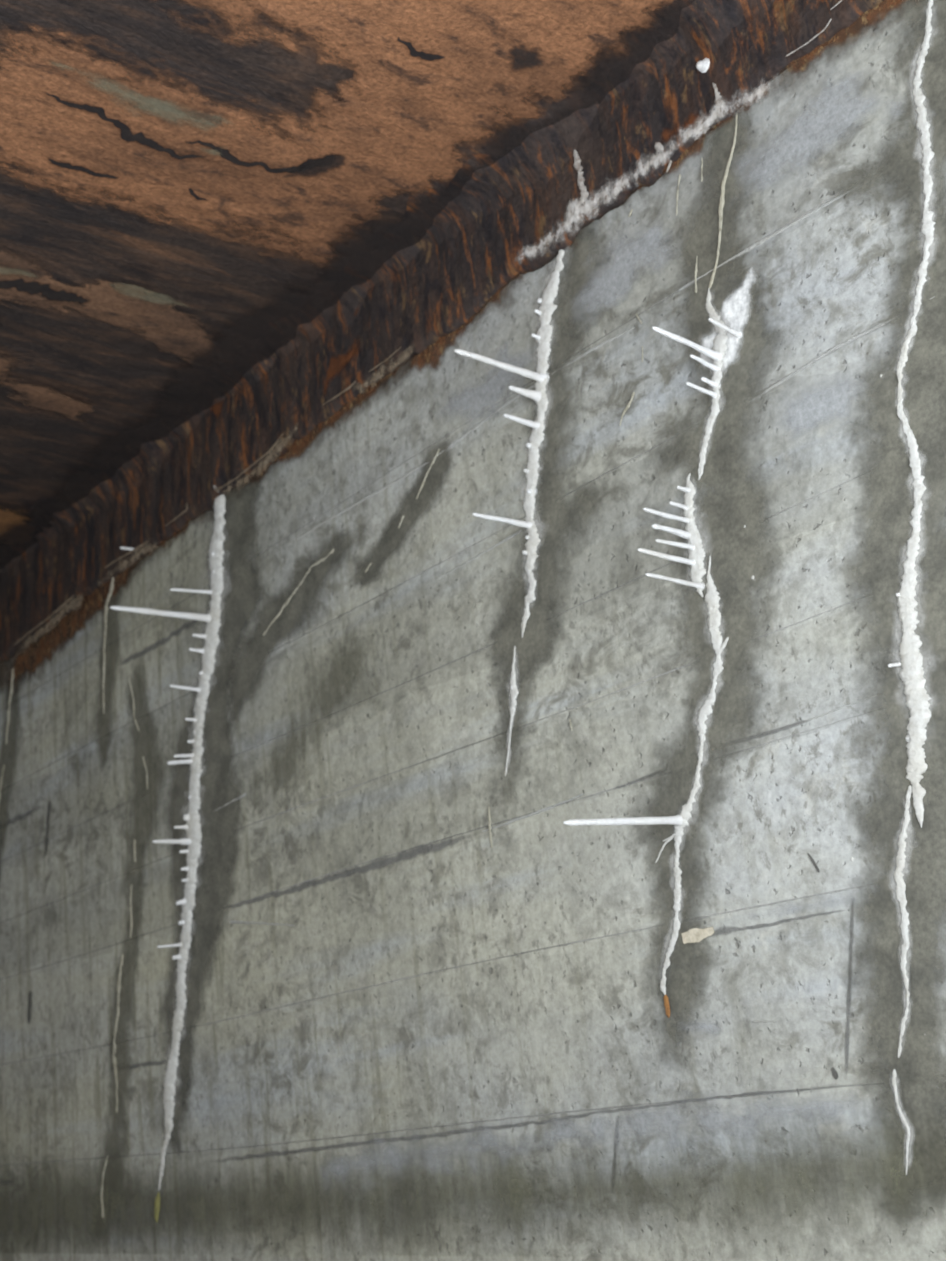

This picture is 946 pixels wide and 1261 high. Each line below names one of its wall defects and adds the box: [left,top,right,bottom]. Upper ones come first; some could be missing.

corrosion [11,519,191,678]
corrosion [0,250,214,364]
crack [102,495,228,1223]
corrosion [0,0,674,264]
damp [0,3,692,584]
corrosion [412,288,501,370]
damp [0,670,946,1249]
crack [454,249,564,776]
crack [563,114,743,1018]
damp [492,58,870,1054]
damp [846,0,946,1163]
crack [888,0,936,1175]